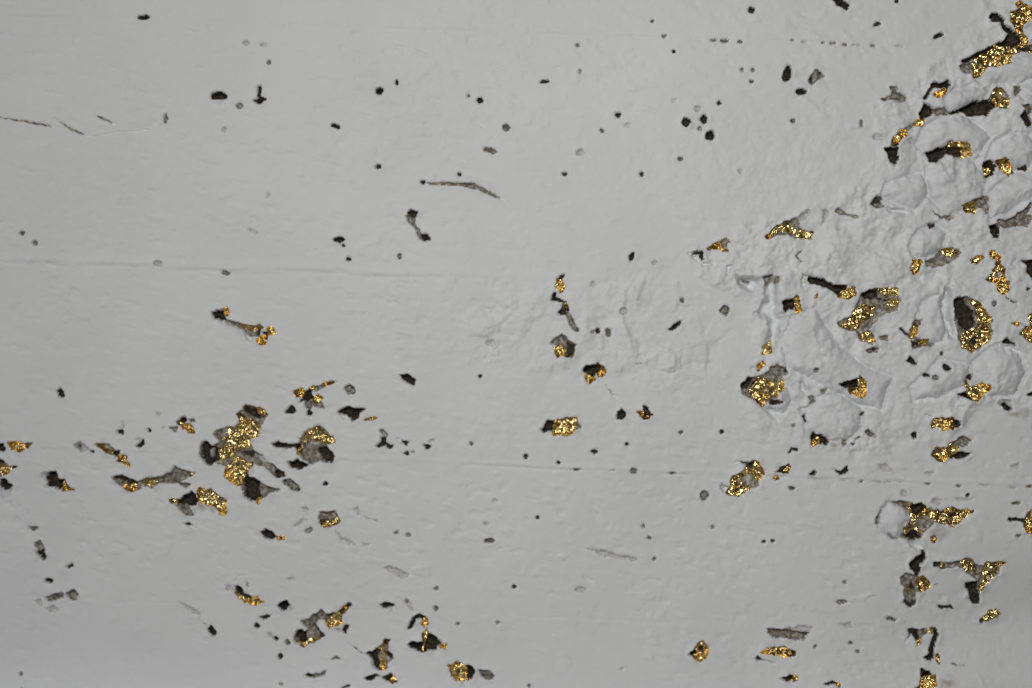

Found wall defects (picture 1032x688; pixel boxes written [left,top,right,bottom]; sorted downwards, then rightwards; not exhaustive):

peeling [782,65,825,95]
peeling [881,86,907,104]
spalling [681,105,714,140]
flaking render [905,27,1032,268]
flaking render [740,207,910,448]
flaking render [909,295,1027,400]
peeling [113,465,191,491]
peeling [200,429,300,498]
flaking render [840,463,973,542]
peeling [35,578,79,613]
peeling [289,606,334,642]
peeling [479,669,494,680]